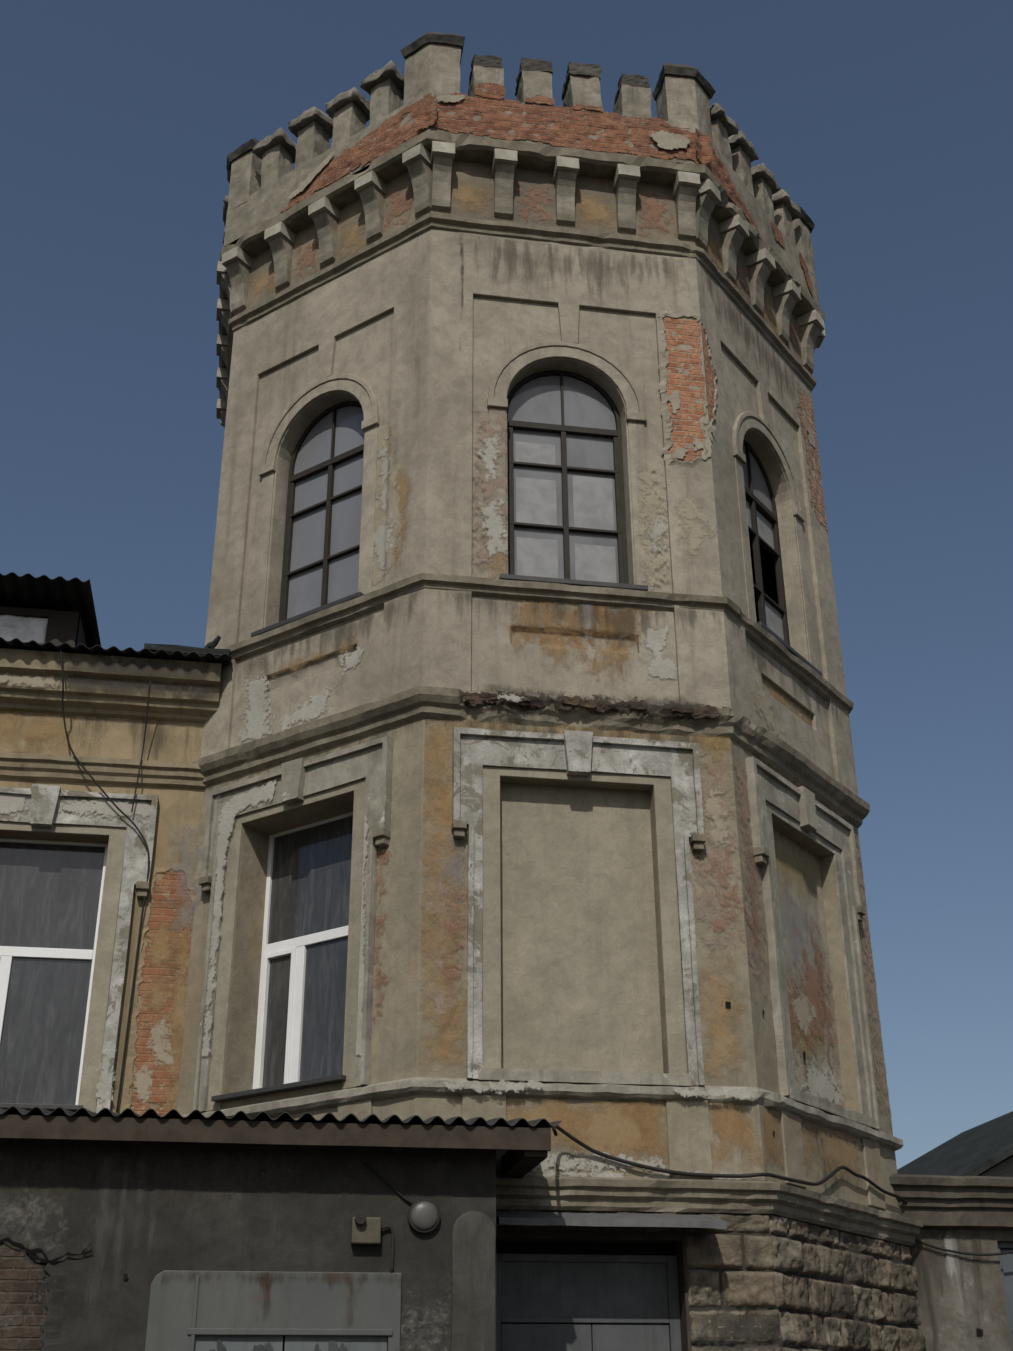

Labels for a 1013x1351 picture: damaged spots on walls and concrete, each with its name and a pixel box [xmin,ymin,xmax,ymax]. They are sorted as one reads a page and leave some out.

flaking render [280,82,813,295]
flaking render [472,411,508,574]
flaking render [637,310,718,589]
flaking render [797,384,828,531]
spalling [464,693,538,707]
spalling [562,696,647,714]
peeling [59,799,151,820]
flaking render [95,862,195,1116]
peeling [201,780,276,1057]
peeling [800,1050,844,1105]
flaking render [0,1225,67,1351]
crack [0,1237,94,1263]